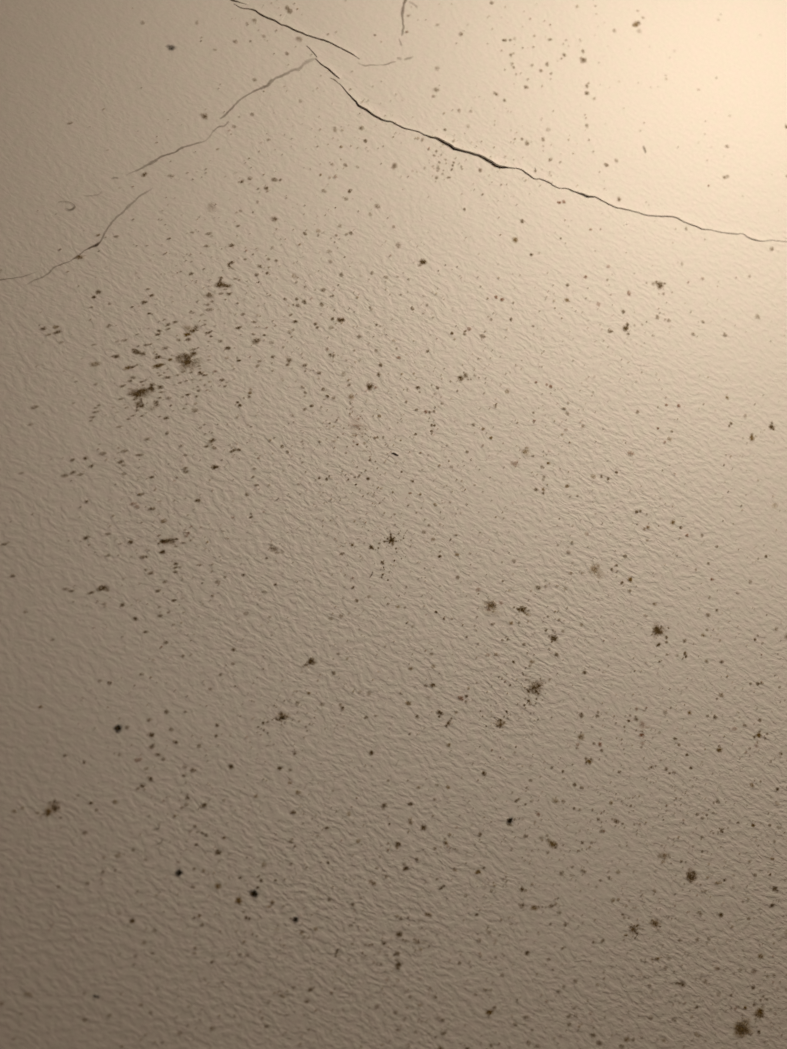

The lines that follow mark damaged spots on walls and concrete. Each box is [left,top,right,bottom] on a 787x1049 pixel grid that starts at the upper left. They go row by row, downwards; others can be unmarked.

crack [232,0,787,242]
water stain [95,234,514,623]
water stain [69,476,208,633]
water stain [438,585,568,751]
water stain [644,737,785,897]
water stain [236,841,316,954]
water stain [689,986,764,1035]